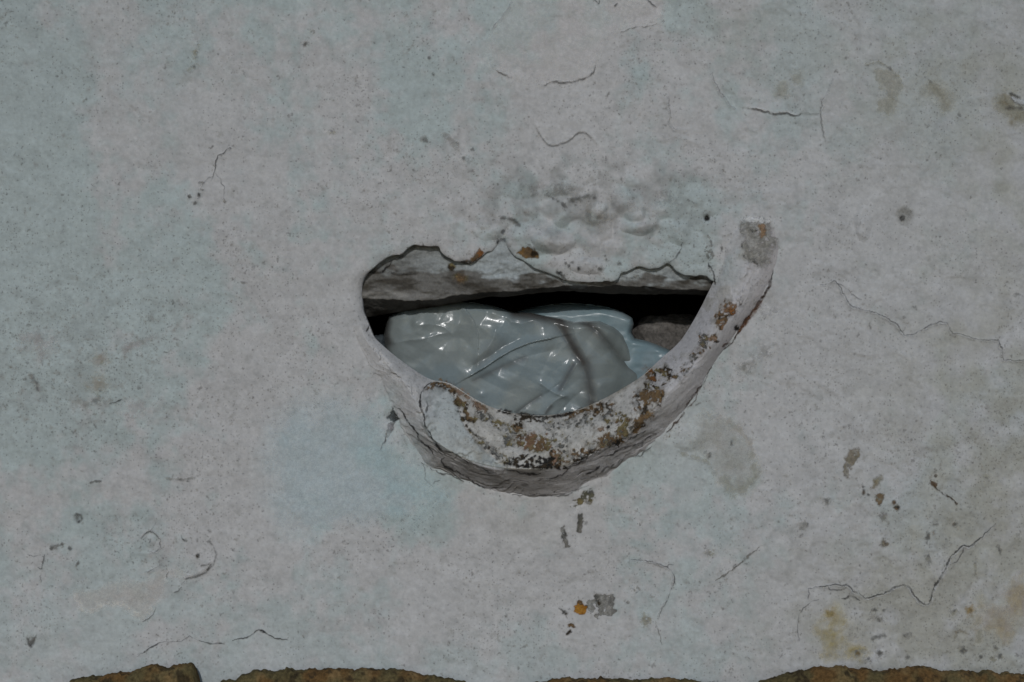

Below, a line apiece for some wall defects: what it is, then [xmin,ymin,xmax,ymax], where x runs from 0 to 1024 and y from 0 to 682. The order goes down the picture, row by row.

spalling [740,216,778,266]
crack [820,280,1018,361]
peeling [427,300,742,467]
crack [797,530,989,631]